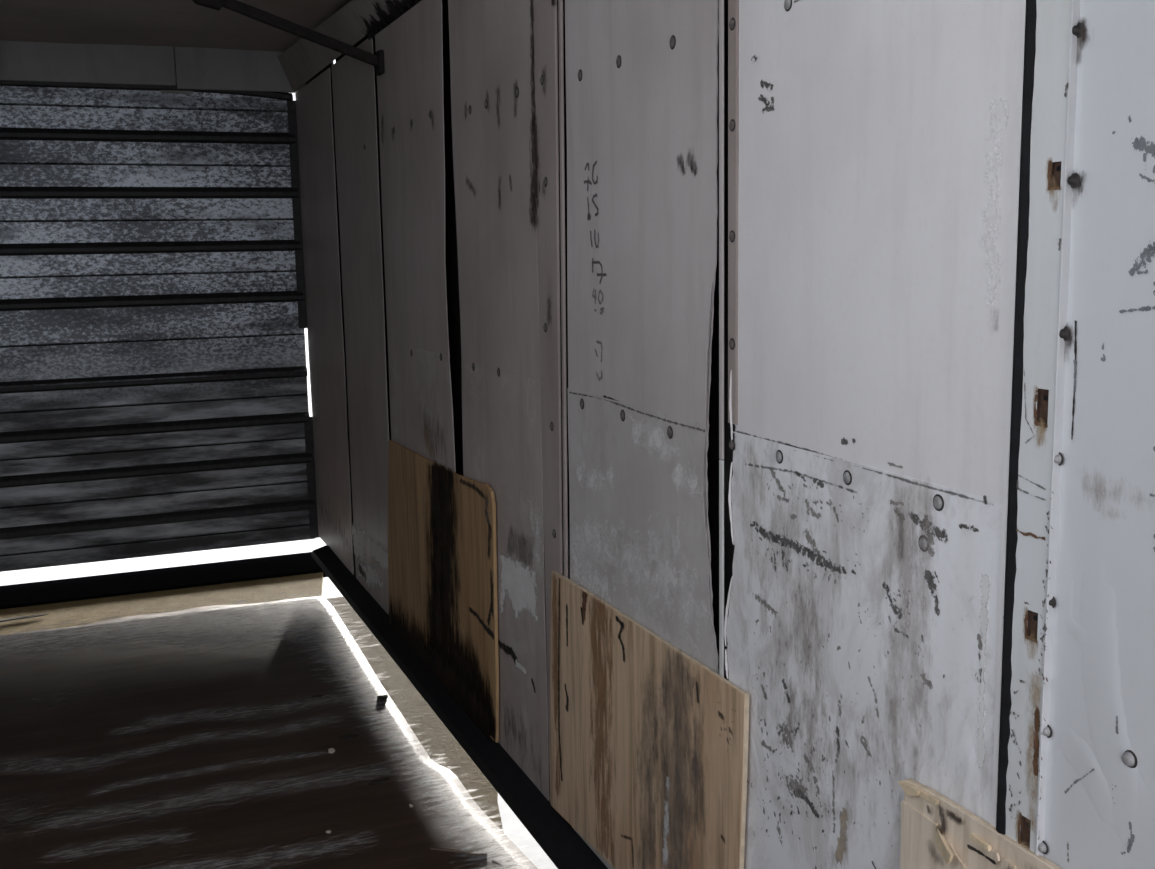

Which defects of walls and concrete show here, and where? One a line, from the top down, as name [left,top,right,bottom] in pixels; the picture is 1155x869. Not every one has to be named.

mould [361,0,422,41]
corrosion [1047,161,1061,190]
peeling [1132,136,1155,182]
peeling [1129,242,1155,296]
corrosion [1034,391,1048,443]
peeling [460,479,539,621]
corrosion [1024,611,1038,643]
damp [832,700,849,863]
corrosion [1009,685,1040,848]
damp [927,805,962,835]